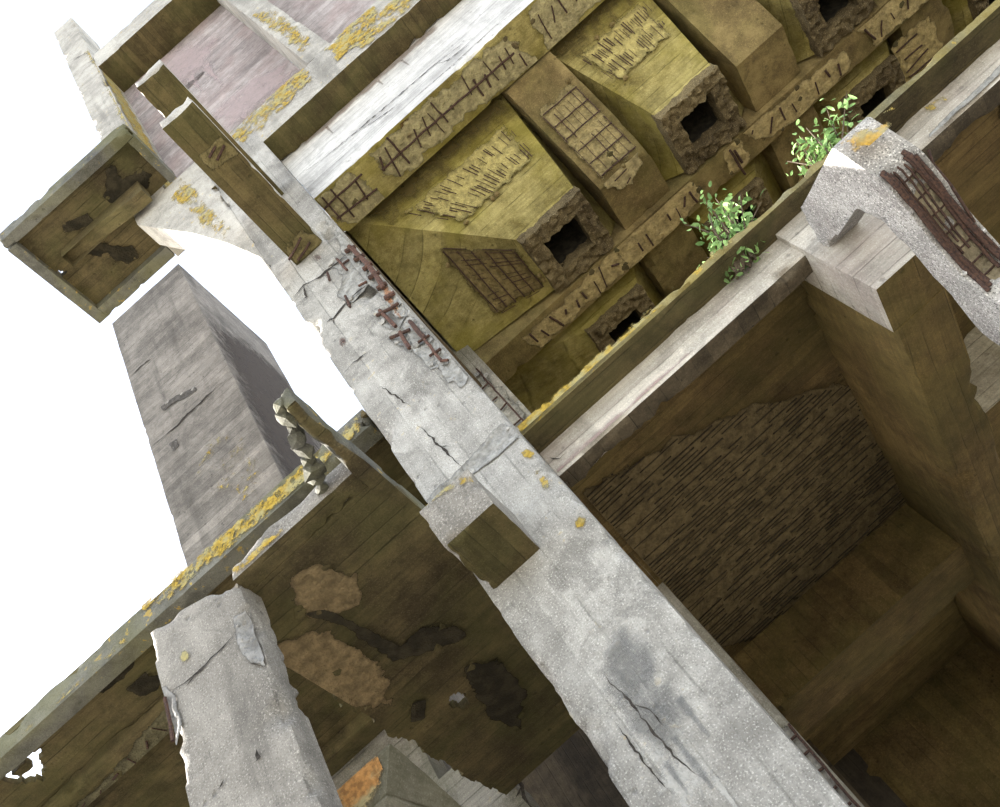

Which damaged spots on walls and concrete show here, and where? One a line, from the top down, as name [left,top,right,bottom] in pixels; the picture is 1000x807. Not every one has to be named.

spalling [528,0,602,50]
spalling [369,36,538,177]
spalling [404,127,533,225]
spalling [540,77,643,190]
spalling [521,182,702,348]
spalling [880,149,1000,292]
spalling [317,172,545,503]
crack [602,673,706,791]
spalling [781,723,861,807]